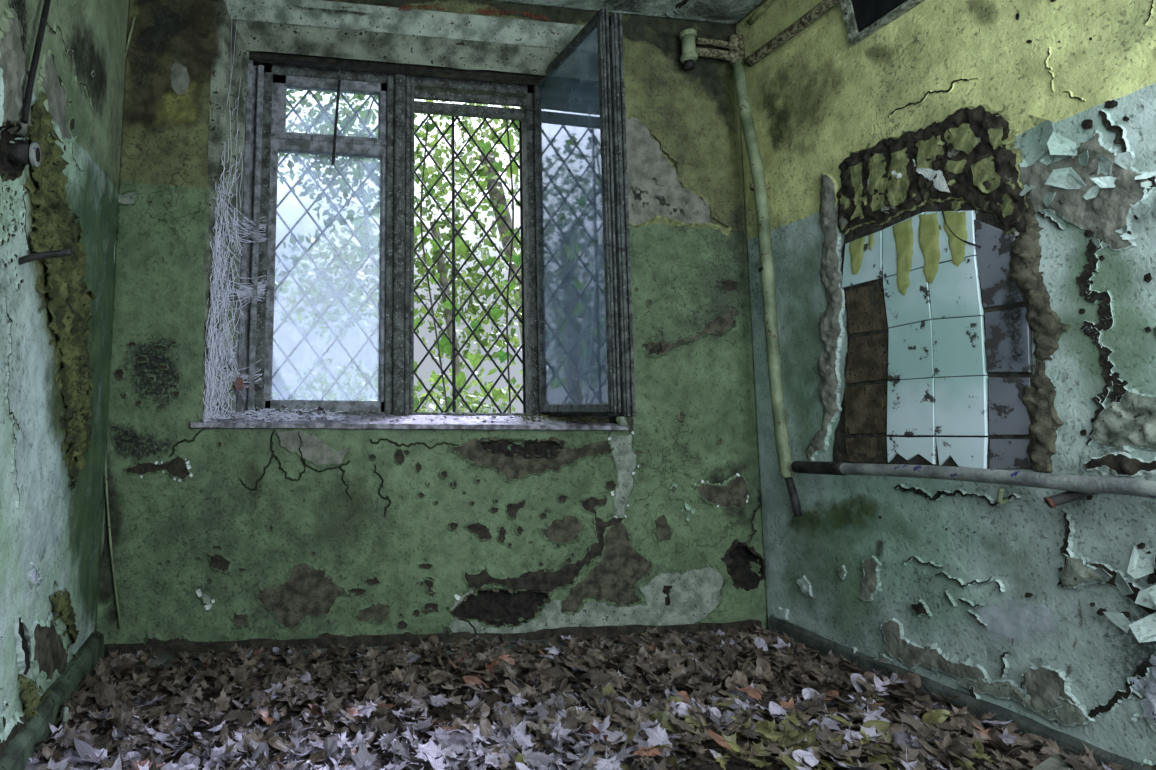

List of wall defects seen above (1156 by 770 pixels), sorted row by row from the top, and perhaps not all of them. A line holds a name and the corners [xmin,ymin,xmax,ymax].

damp [8,0,28,53]
crack [1145,0,1156,25]
peeling [1104,100,1129,121]
peeling [625,111,733,236]
peeling [634,278,739,359]
crack [2,289,20,510]
damp [126,339,180,409]
crack [240,431,459,517]
flaking render [441,417,750,635]
flaking render [0,612,68,686]
peeling [873,618,1095,727]
peeling [1059,542,1156,732]